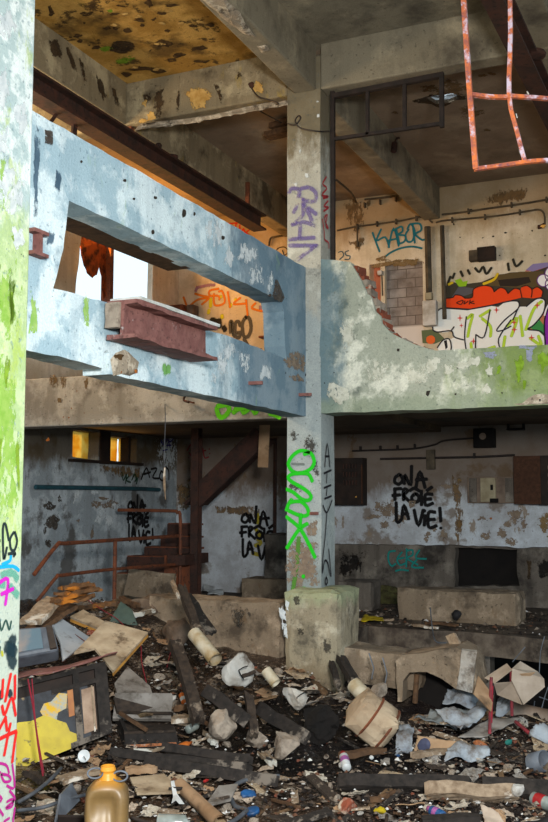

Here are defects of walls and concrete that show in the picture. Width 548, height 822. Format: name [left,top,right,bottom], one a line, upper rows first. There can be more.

peeling [340,323,354,349]
peeling [354,256,497,394]
peeling [519,345,537,362]